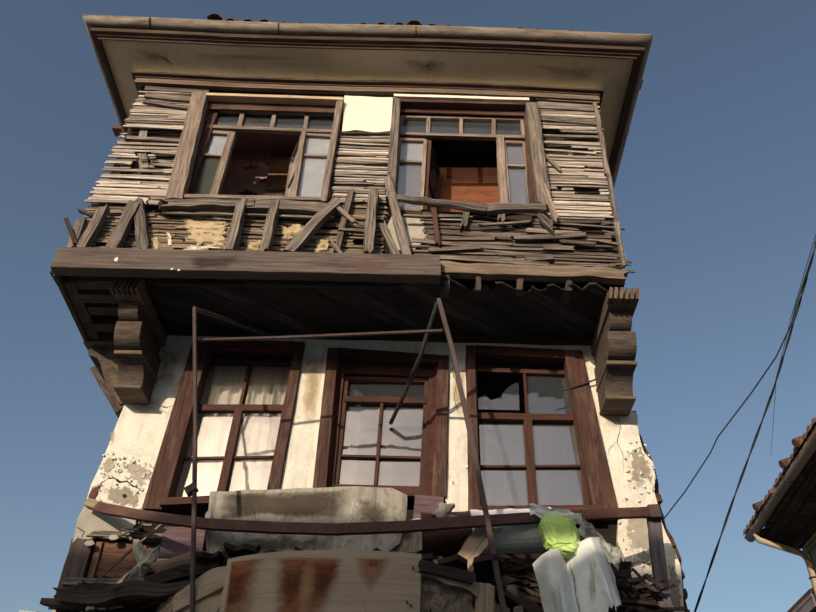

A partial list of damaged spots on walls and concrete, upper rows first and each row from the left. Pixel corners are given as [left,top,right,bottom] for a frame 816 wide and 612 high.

crack [95,477,138,498]
peeling [88,452,155,509]
leakage [229,492,339,522]
peeling [624,440,663,506]
rust [225,561,255,612]
leakage [249,534,313,550]
rust [282,558,338,612]
rust [362,559,384,582]
peeling [618,518,650,576]